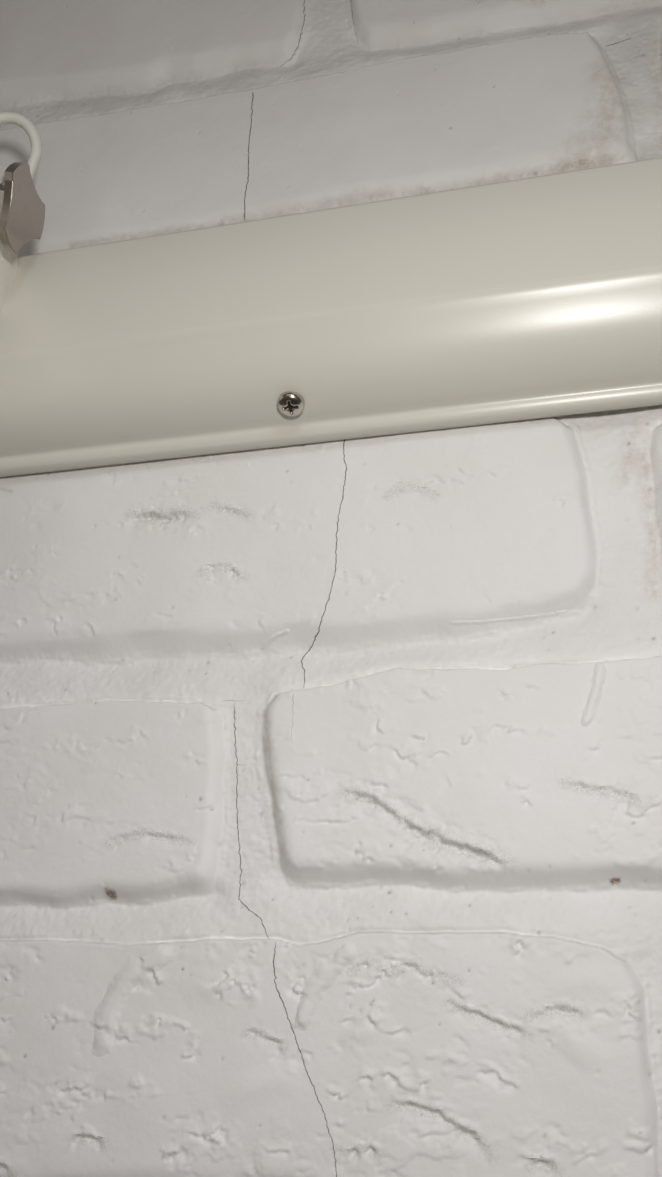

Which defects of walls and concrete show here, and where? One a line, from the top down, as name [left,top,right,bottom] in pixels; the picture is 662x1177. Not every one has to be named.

crack [244,92,254,220]
crack [280,0,306,67]
crack [291,439,347,737]
crack [228,700,337,1177]